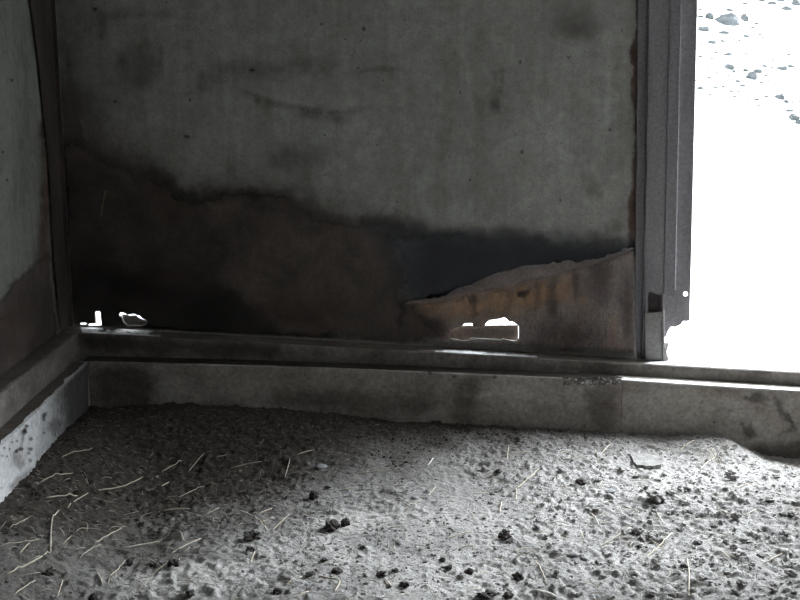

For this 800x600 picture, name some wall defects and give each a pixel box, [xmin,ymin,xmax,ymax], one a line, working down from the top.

damp [80,327,276,354]
damp [366,221,635,309]
peeling [397,247,633,352]